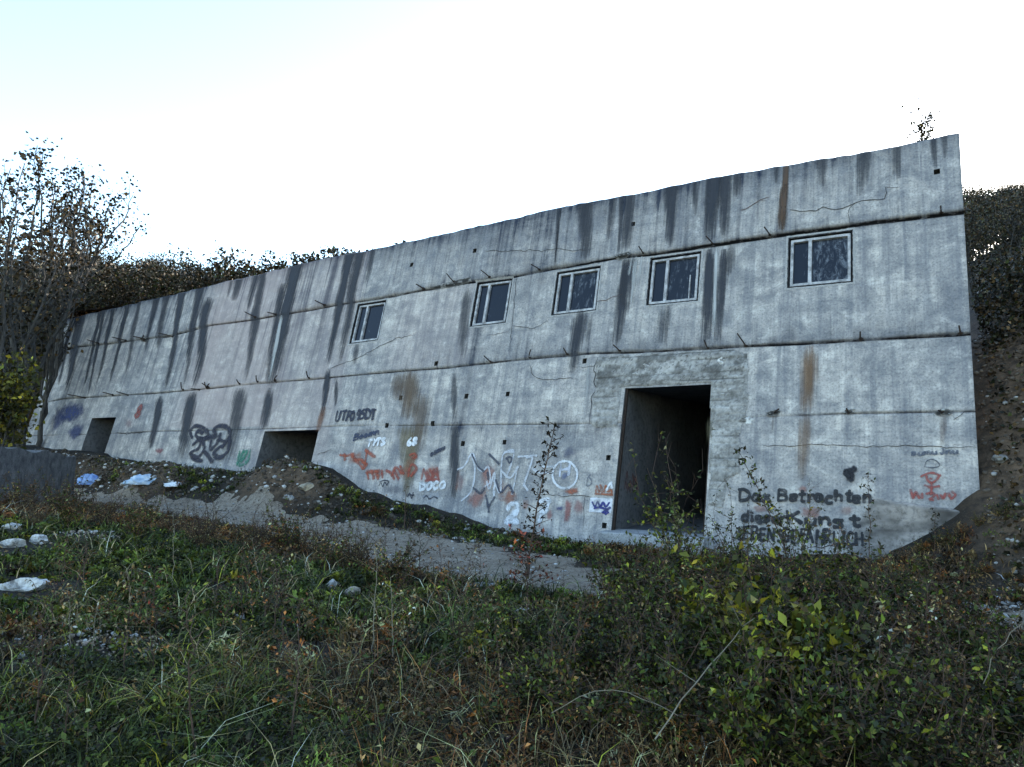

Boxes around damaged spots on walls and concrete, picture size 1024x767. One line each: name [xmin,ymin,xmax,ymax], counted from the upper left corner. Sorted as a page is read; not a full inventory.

leakage [579,202,592,256]
leakage [664,185,677,244]
leakage [693,173,741,338]
corrosion [778,166,788,230]
crack [790,187,896,224]
leakage [59,287,213,455]
leakage [233,273,266,376]
leakage [260,264,303,428]
leakage [321,250,375,414]
leakage [613,258,642,343]
corrosion [803,351,815,405]
crack [764,442,972,450]